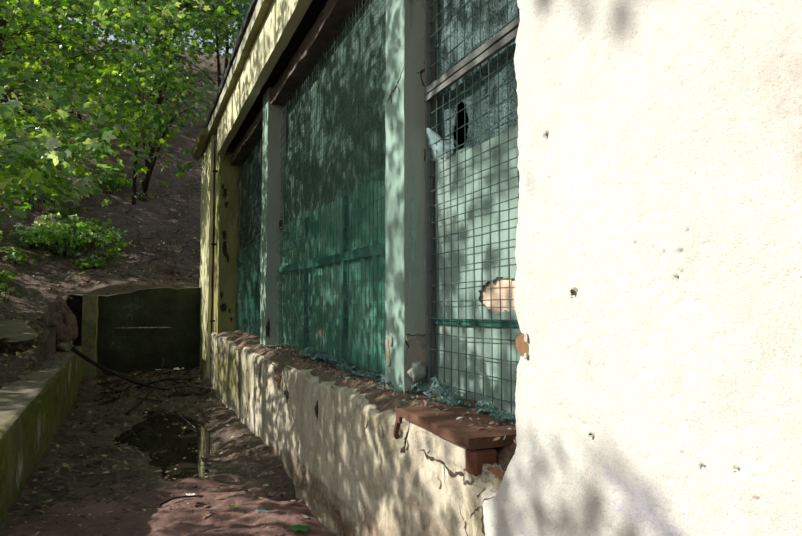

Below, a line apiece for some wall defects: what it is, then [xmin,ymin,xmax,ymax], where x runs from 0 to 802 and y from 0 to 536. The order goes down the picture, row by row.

crack [387,62,425,104]
spalling [385,331,393,367]
spalling [405,333,426,383]
flaking render [515,333,528,359]
flaking render [273,372,289,401]
crack [420,449,494,536]